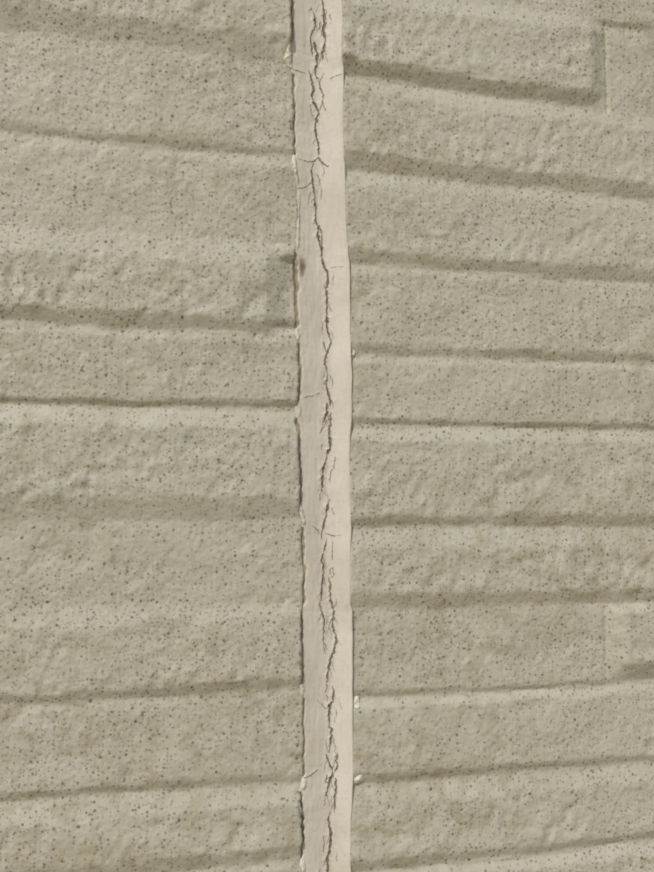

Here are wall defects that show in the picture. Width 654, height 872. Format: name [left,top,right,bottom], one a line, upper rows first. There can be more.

crack [292,0,342,872]